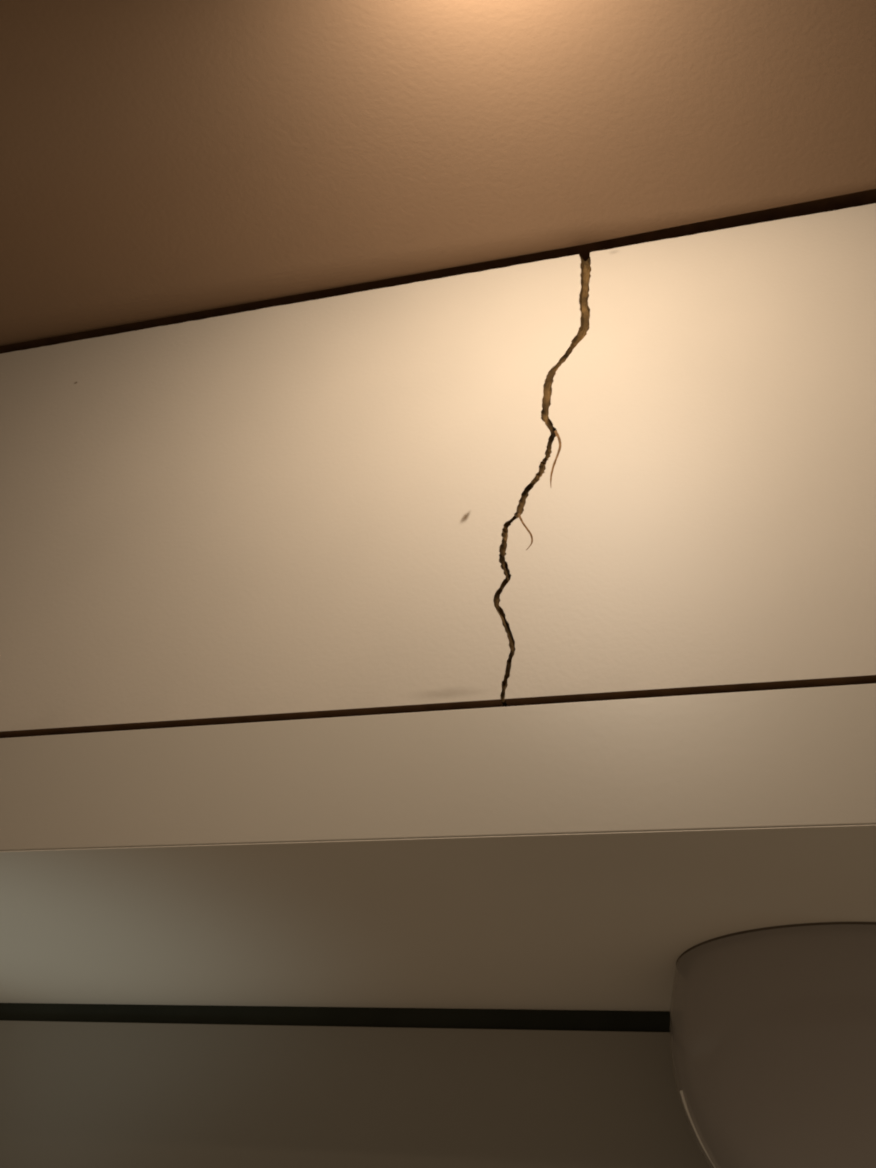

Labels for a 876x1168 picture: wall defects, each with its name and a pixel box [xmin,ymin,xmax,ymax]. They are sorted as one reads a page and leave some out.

crack [493,255,591,702]